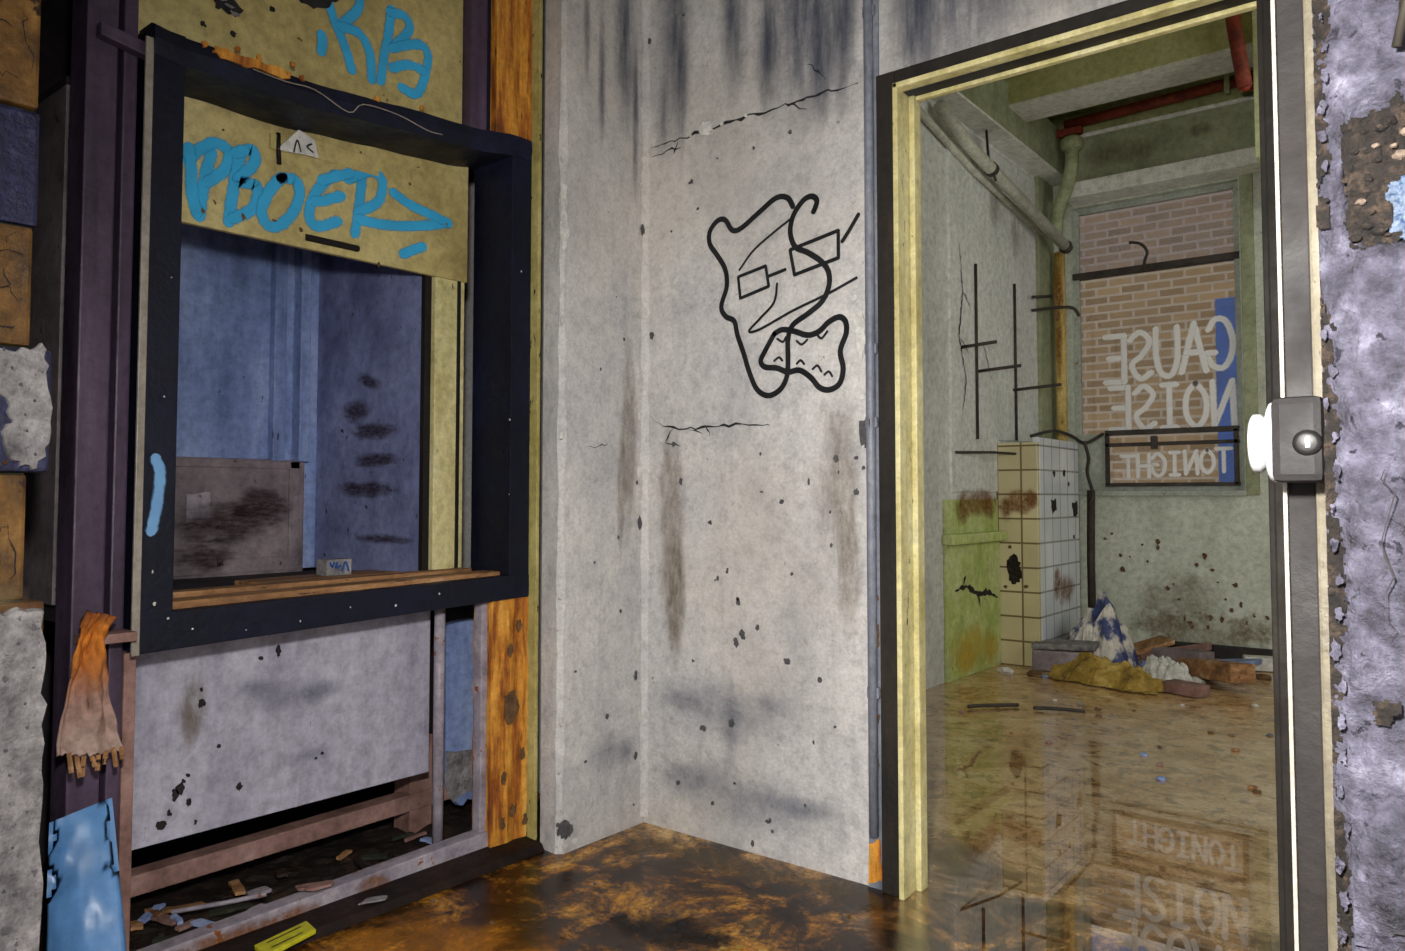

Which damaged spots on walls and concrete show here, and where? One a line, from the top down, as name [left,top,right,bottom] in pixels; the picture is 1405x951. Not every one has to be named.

water stain [621,4,629,74]
water stain [793,0,822,75]
crack [652,64,858,157]
spalling [1311,0,1405,250]
flaking render [0,343,53,470]
crack [651,417,769,447]
corrosion [959,491,1037,522]
crack [955,576,998,607]
spalling [1003,545,1028,589]
flaking render [0,606,47,951]
water stain [616,916,722,948]